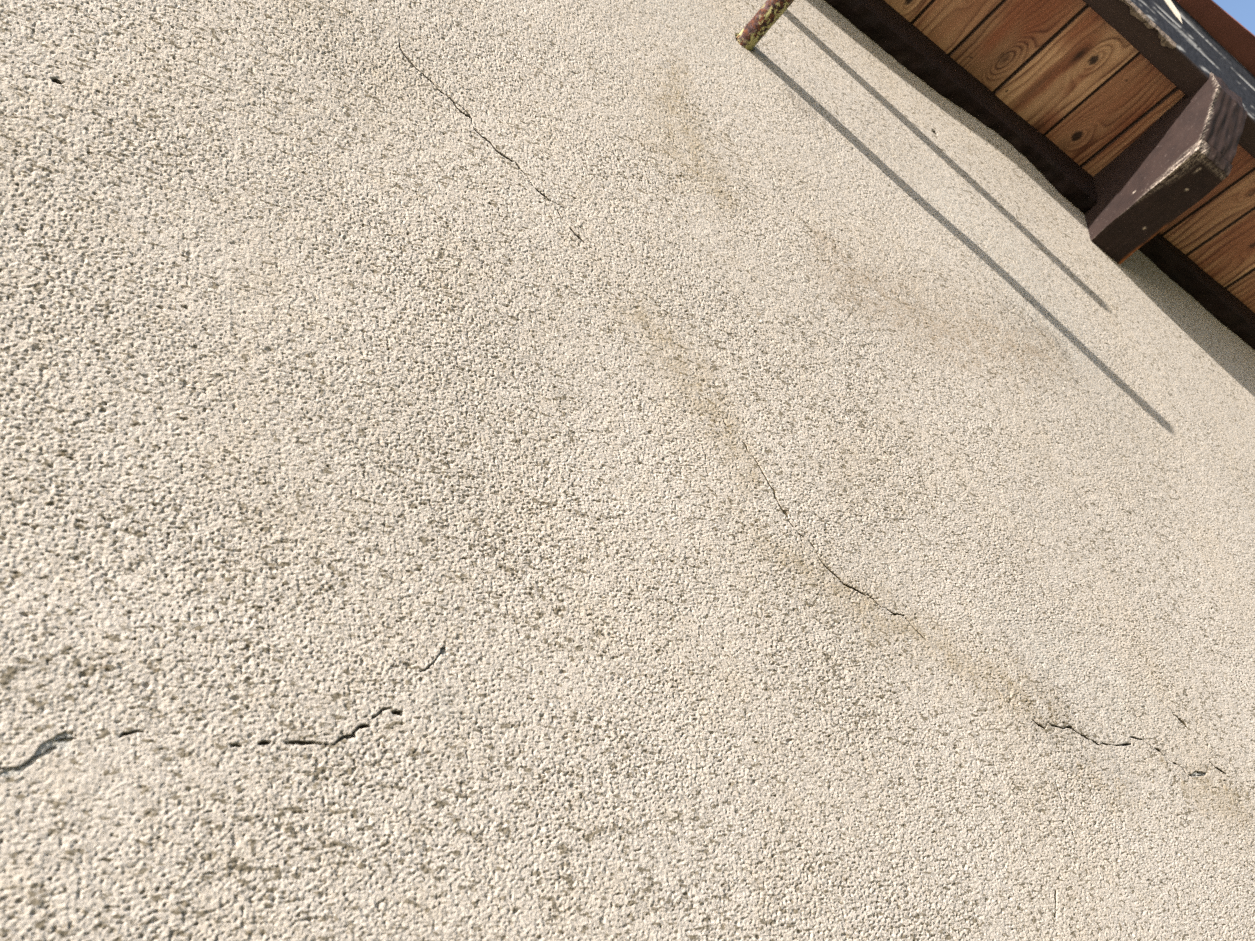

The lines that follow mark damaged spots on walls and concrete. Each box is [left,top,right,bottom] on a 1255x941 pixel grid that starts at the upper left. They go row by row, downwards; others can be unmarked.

crack [399,42,585,243]
crack [724,422,926,640]
crack [0,732,76,777]
crack [231,708,402,747]
crack [1034,721,1226,777]